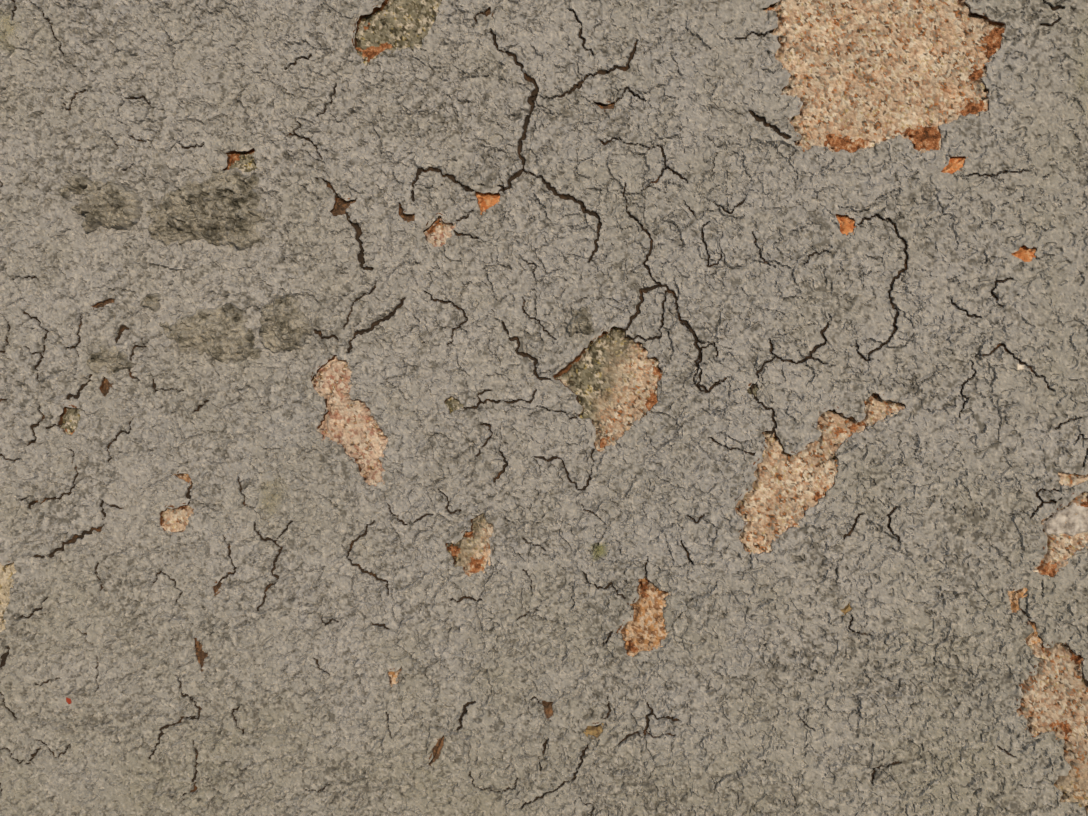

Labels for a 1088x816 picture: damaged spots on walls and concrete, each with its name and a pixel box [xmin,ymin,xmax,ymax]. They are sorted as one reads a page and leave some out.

crack [0,311,92,509]
peeling [306,356,388,486]
crack [285,84,468,353]
peeling [347,0,442,65]
crack [463,258,577,483]
crack [411,9,646,262]
peeling [555,319,663,452]
crack [600,137,831,456]
peeling [728,386,905,554]
crack [855,214,908,361]
peeling [762,0,1005,174]
peeling [1007,467,1088,815]